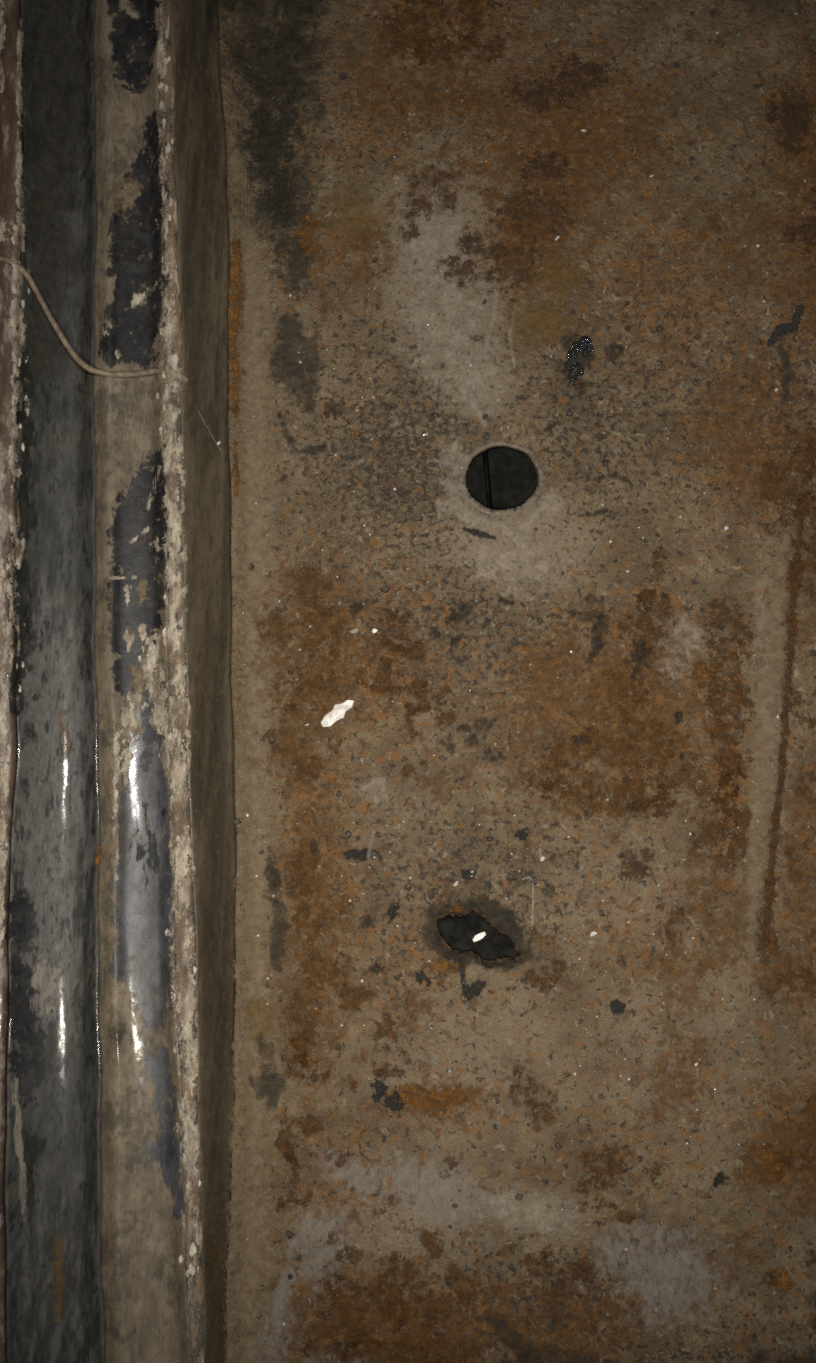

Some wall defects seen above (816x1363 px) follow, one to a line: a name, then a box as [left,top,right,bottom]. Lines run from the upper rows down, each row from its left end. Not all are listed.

rust [398,169,457,241]
rust [434,151,572,294]
peeling [98,0,202,1277]
rust [256,565,455,783]
rust [519,545,754,868]
rust [757,421,816,1001]
rust [617,842,654,881]
rust [281,839,374,1082]
rust [341,1013,475,1117]
rust [275,1115,325,1216]
rust [577,1144,636,1223]
rust [300,1231,478,1363]